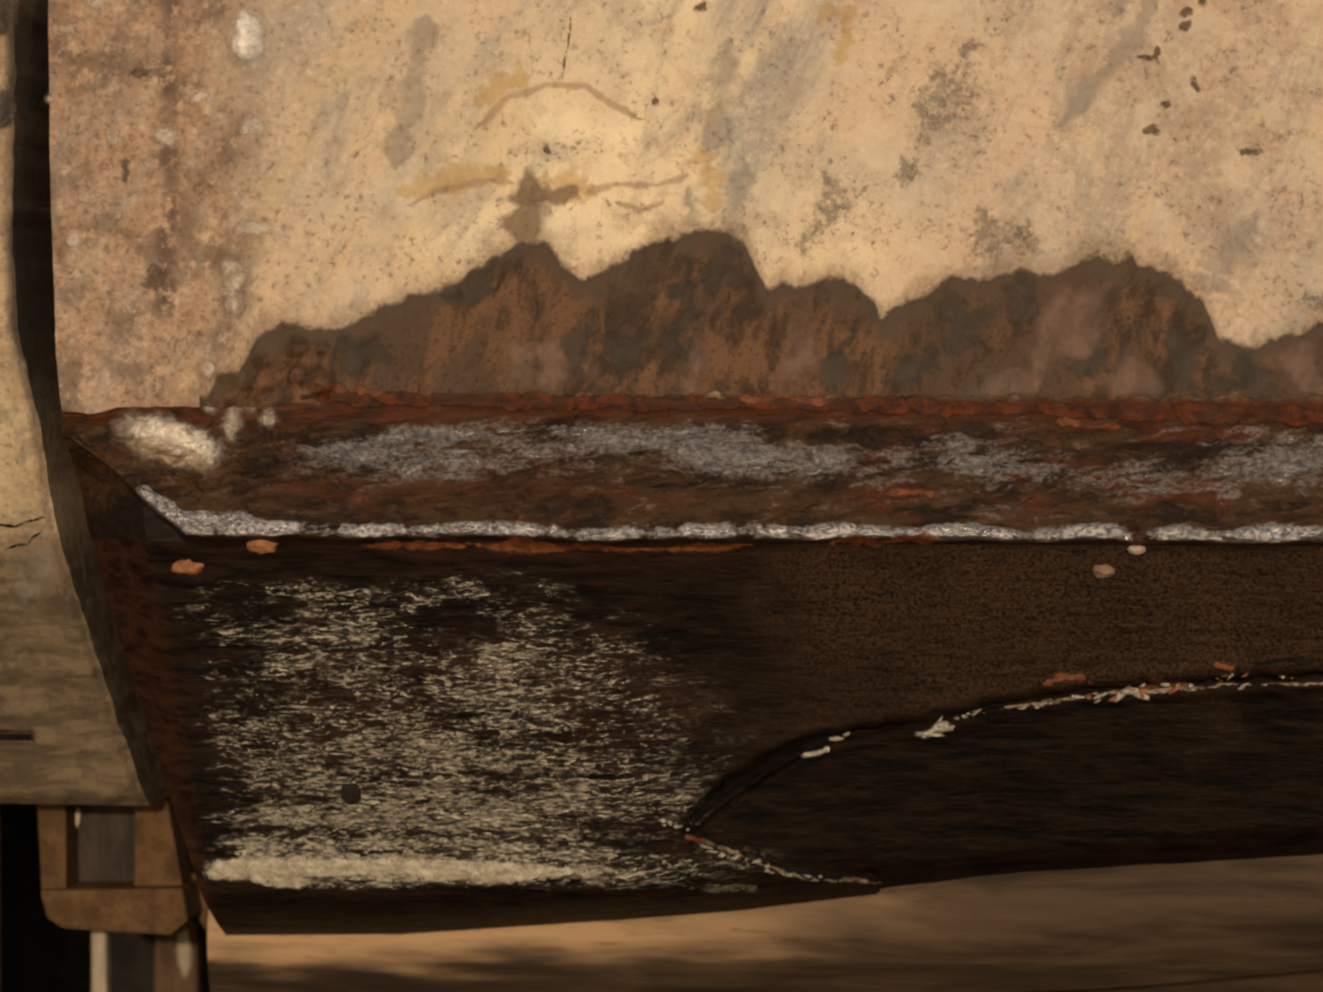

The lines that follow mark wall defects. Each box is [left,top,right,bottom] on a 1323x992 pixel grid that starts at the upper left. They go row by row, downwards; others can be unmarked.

rust [300,382,1323,431]
rust [885,487,943,499]
crack [0,517,45,550]
rust [830,533,938,549]
rust [171,559,204,576]